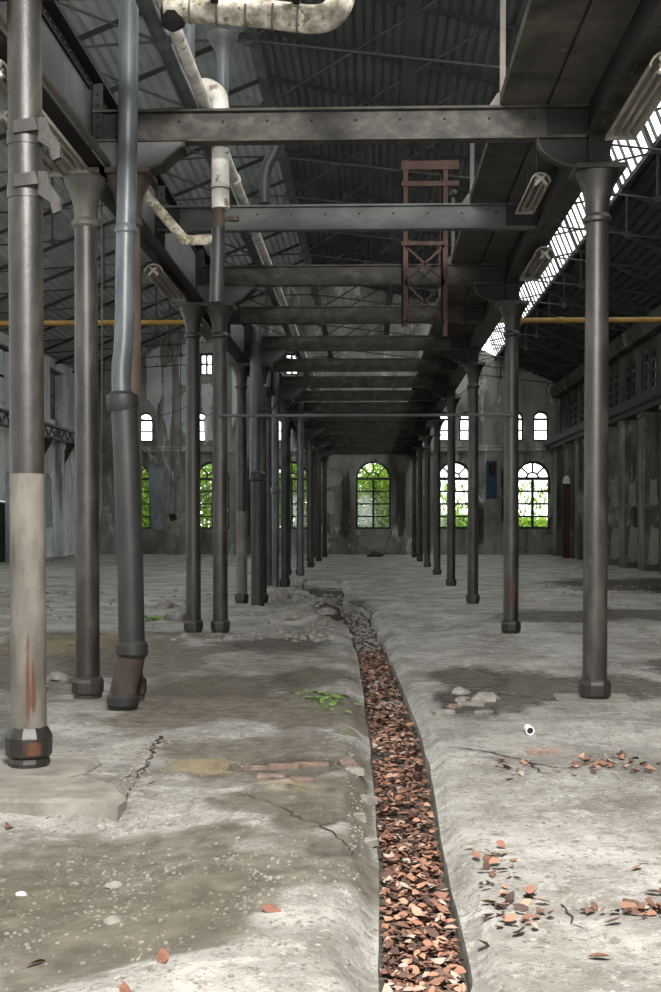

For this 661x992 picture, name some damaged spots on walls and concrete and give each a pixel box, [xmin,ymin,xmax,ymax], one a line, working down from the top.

corrosion [26,640,36,716]
damp [426,667,580,712]
damp [607,660,661,699]
crack [126,736,164,800]